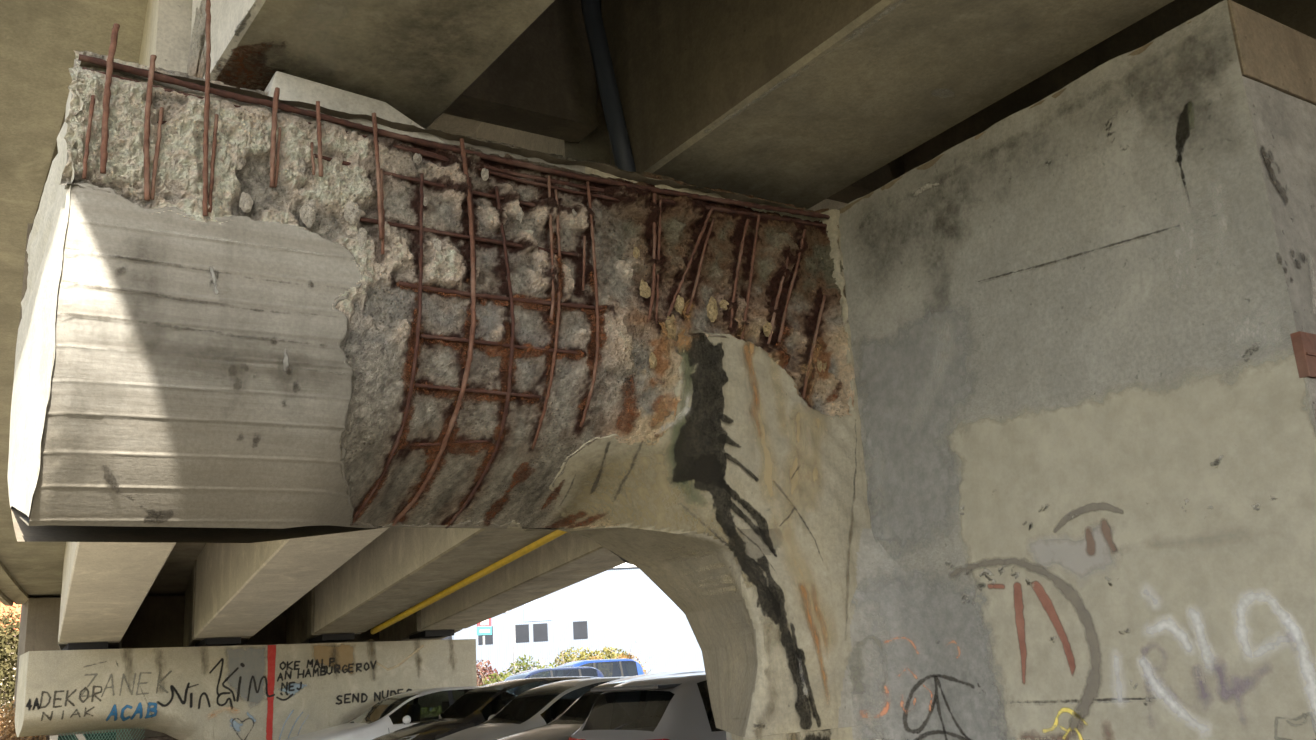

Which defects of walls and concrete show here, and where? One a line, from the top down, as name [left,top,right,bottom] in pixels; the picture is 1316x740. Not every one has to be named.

corrosion [212,43,283,91]
spalling [59,0,855,529]
leakage [1173,102,1195,288]
corrosion [353,232,608,528]
corrosion [615,375,689,437]
corrosion [775,325,842,407]